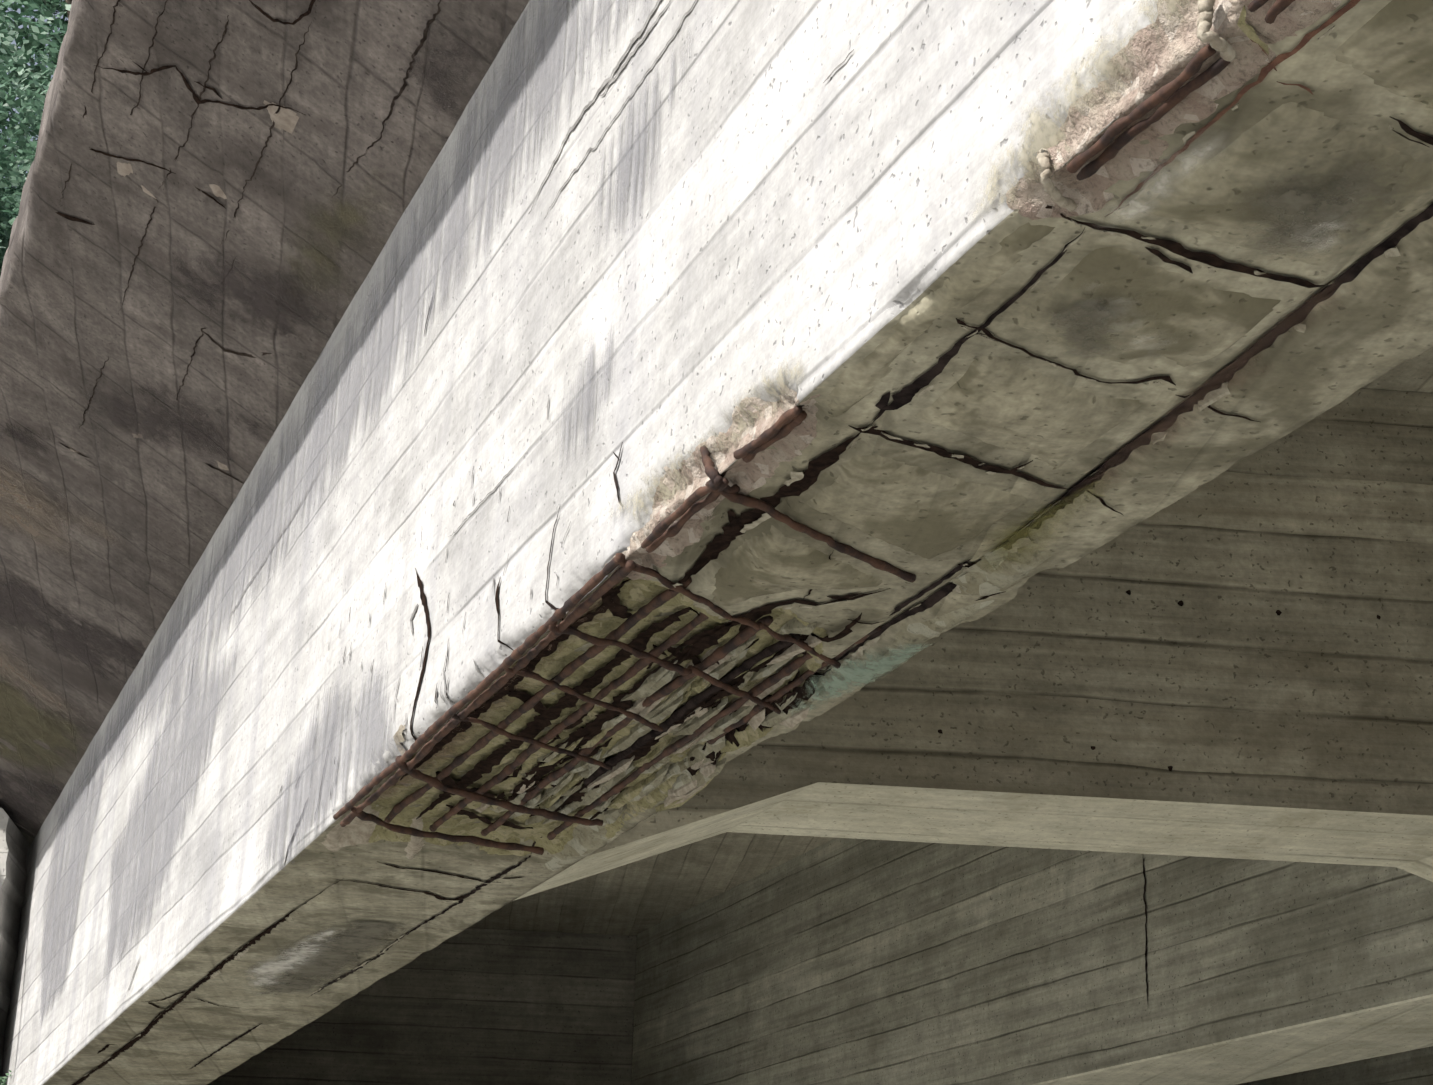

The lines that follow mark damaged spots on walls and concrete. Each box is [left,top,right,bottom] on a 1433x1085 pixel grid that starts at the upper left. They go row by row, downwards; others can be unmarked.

crack [55,0,316,305]
crack [332,0,441,198]
spalling [1005,0,1342,220]
crack [176,313,272,400]
crack [669,0,1433,672]
water stain [0,0,624,1021]
crack [393,554,519,755]
crack [545,507,571,621]
crack [613,442,623,505]
spalling [321,384,1053,860]
crack [72,837,542,1085]
crack [1141,858,1149,1002]